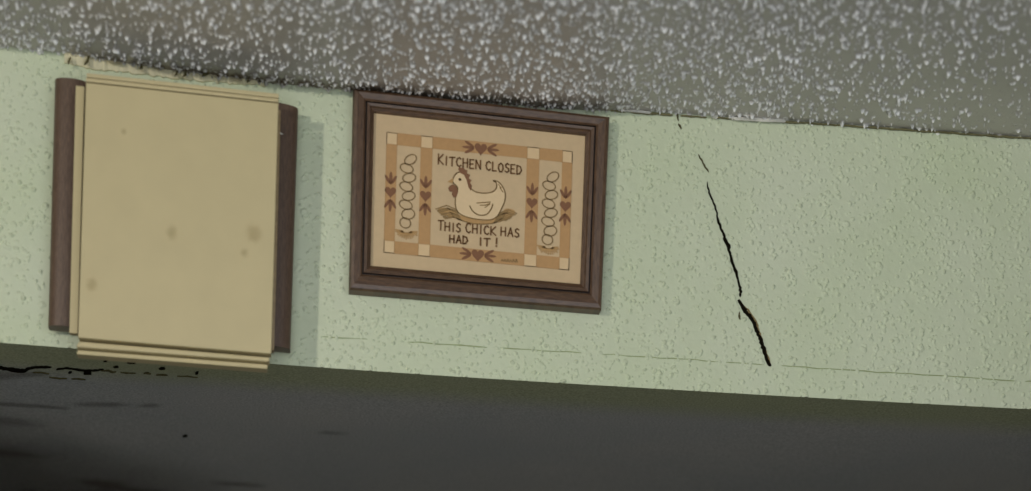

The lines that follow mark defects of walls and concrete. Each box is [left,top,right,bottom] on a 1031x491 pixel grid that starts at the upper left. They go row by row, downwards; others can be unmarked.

crack [610,110,756,129]
crack [781,121,1031,139]
crack [409,154,1031,382]